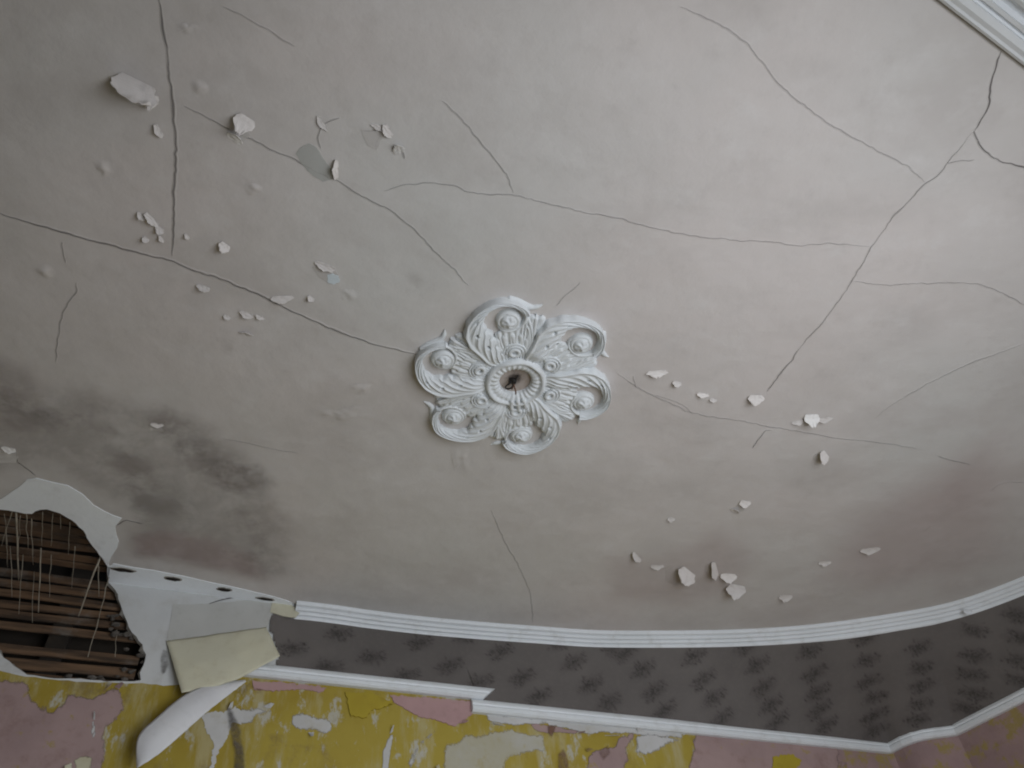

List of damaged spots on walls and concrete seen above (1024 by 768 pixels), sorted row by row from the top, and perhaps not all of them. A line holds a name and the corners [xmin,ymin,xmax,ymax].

peeling [109,72,159,111]
peeling [227,113,255,145]
peeling [296,143,339,182]
crack [158,0,1024,392]
peeling [136,212,164,243]
peeling [748,395,765,406]
peeling [791,414,833,428]
peeling [813,450,829,465]
peeling [630,552,746,600]
flaking render [0,478,296,768]
peeling [202,680,332,768]
peeling [345,691,847,768]